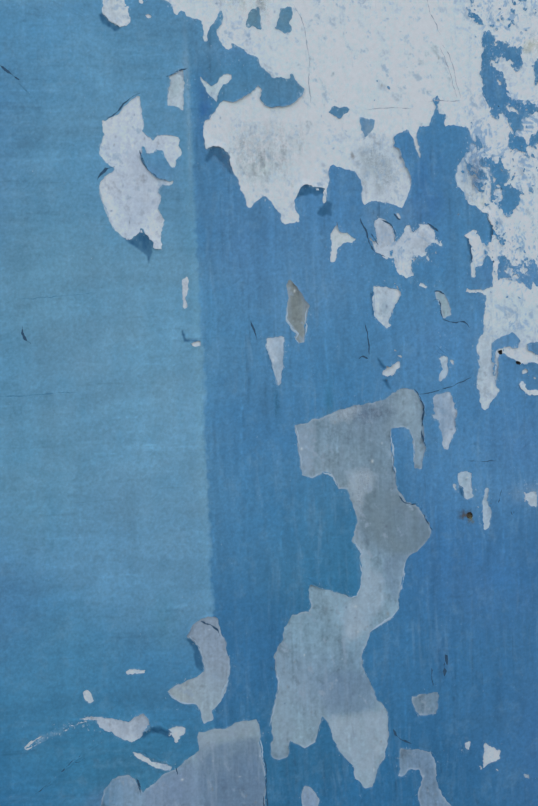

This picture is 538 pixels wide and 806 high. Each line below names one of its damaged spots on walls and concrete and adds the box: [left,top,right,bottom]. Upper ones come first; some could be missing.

peeling [102,0,130,27]
peeling [99,96,182,249]
peeling [166,0,538,410]
peeling [101,388,457,806]
peeling [65,714,149,742]